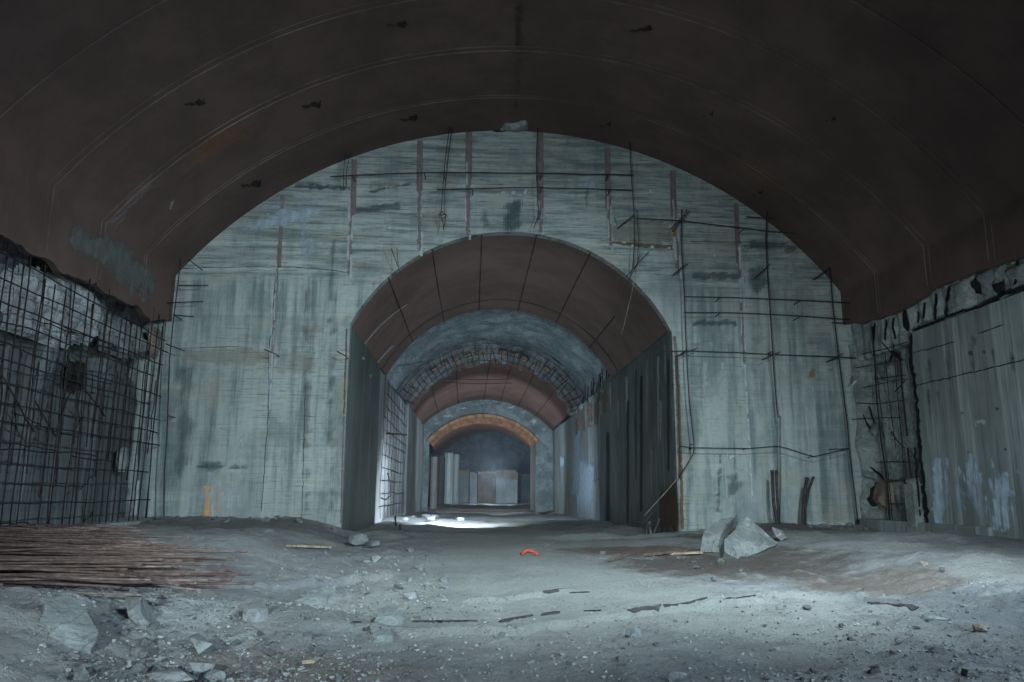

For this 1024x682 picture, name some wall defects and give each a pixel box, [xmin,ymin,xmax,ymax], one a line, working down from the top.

spalling [0,263,161,360]
spalling [970,259,1024,301]
spalling [116,447,130,472]
spalling [380,343,611,517]
leakage [930,452,1014,532]